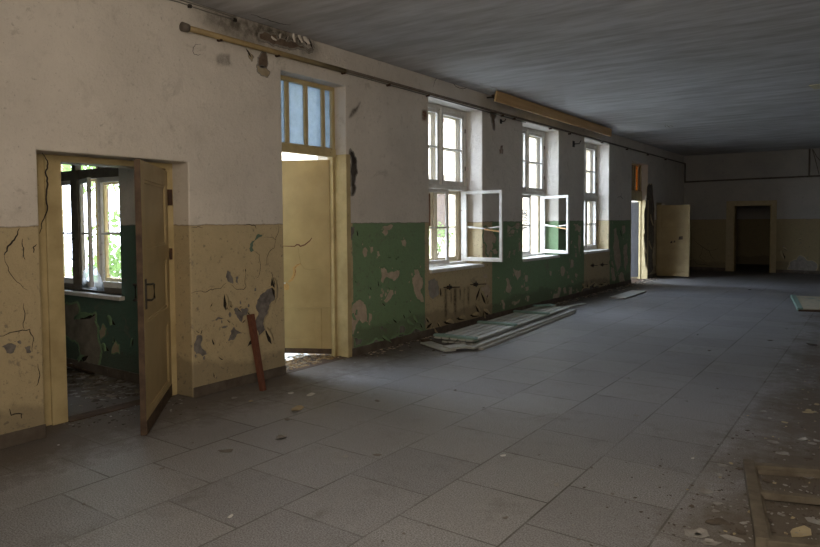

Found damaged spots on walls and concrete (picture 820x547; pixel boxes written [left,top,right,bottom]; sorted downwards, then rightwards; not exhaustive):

flaking render [246,30,316,78]
flaking render [349,148,358,196]
crack [4,153,49,346]
crack [193,224,312,303]
flaking render [351,225,407,337]
peeling [426,221,530,333]
peeling [549,222,581,299]
peeling [65,301,120,365]
peeling [192,279,278,363]